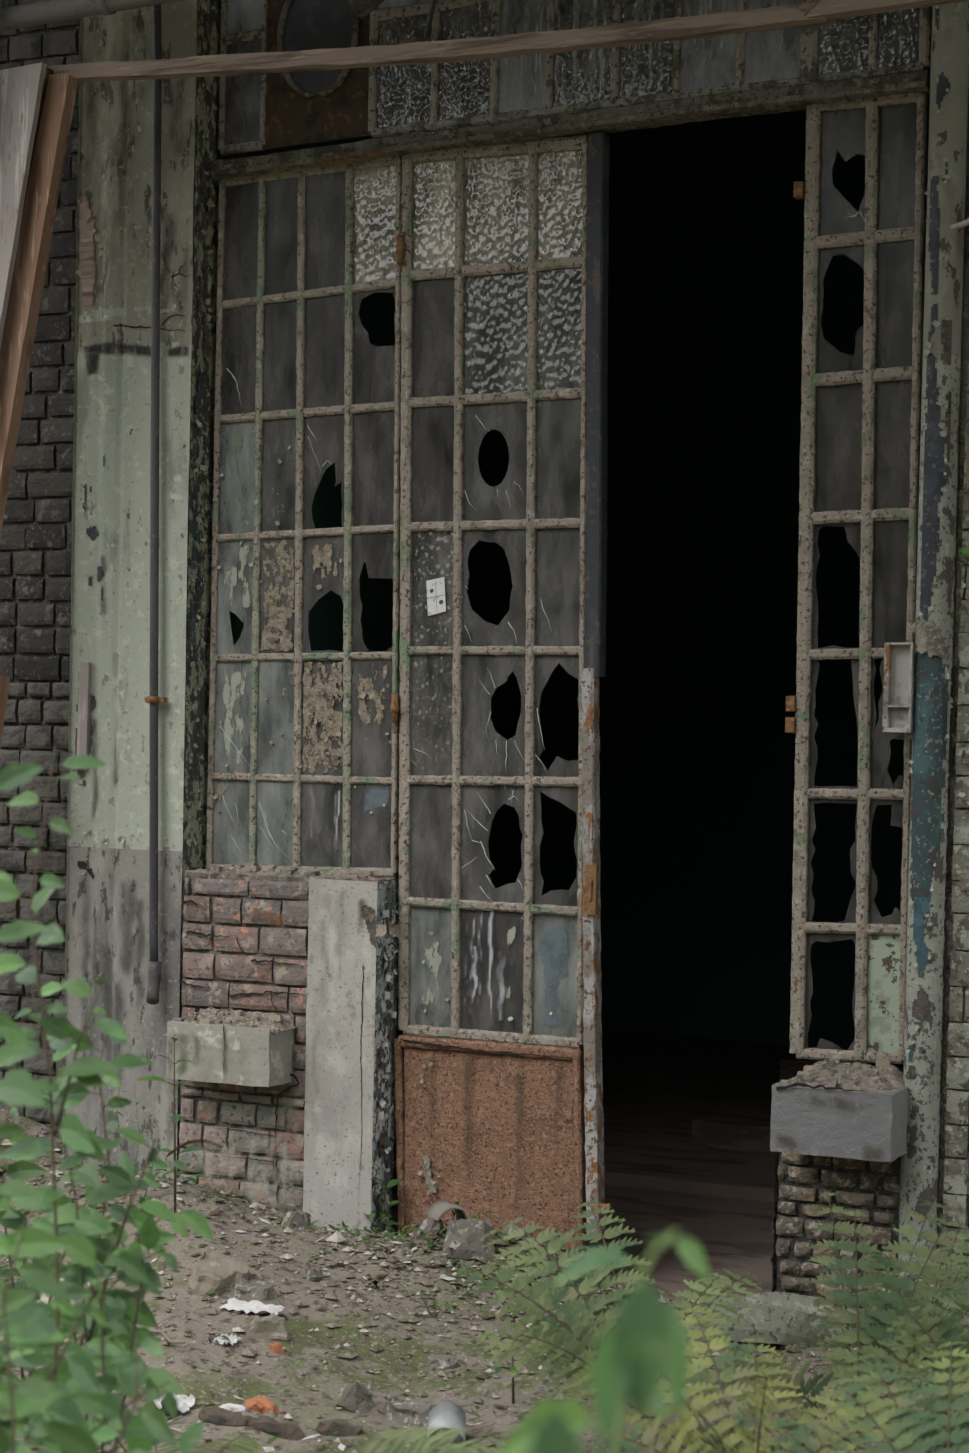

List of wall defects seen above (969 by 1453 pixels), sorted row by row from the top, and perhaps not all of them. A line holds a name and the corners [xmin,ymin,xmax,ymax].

peeling [904,158,969,1079]
peeling [360,905,399,1219]
peeling [907,1101,935,1182]